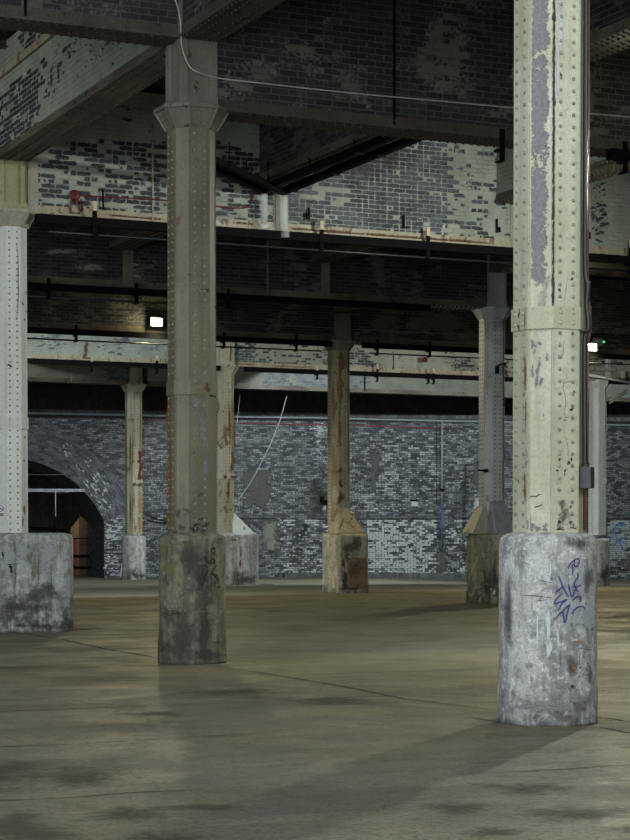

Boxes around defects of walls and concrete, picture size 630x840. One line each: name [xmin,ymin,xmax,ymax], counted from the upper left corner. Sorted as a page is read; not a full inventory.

peeling [528,0,563,306]
peeling [590,182,609,243]
rust [129,424,144,534]
damp [3,583,56,615]